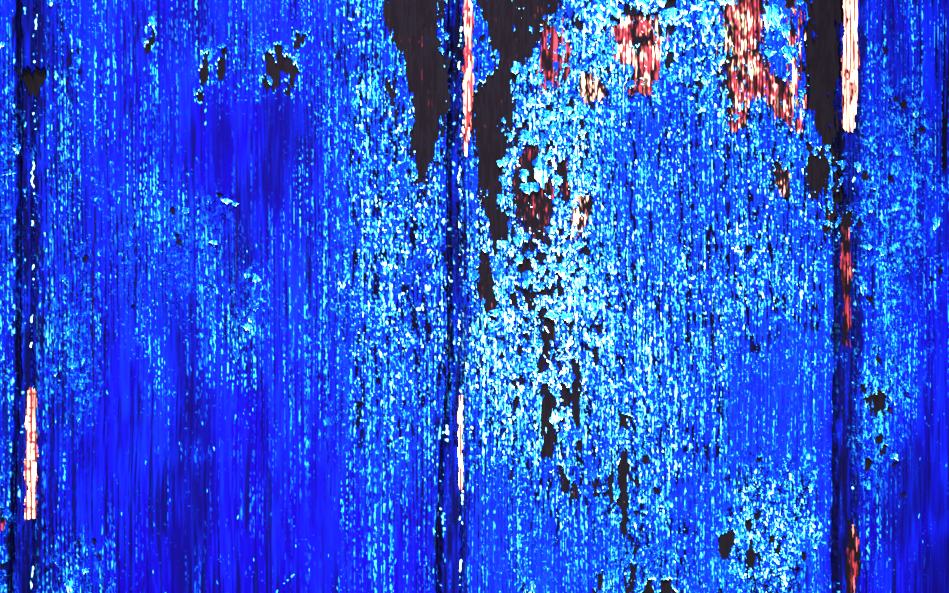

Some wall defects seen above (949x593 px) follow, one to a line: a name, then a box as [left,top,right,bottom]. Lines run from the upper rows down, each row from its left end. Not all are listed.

peeling [141,16,155,54]
peeling [193,42,226,102]
peeling [262,25,312,97]
peeling [378,0,452,204]
peeling [468,0,806,501]
peeling [590,406,677,593]
peeling [716,454,818,593]